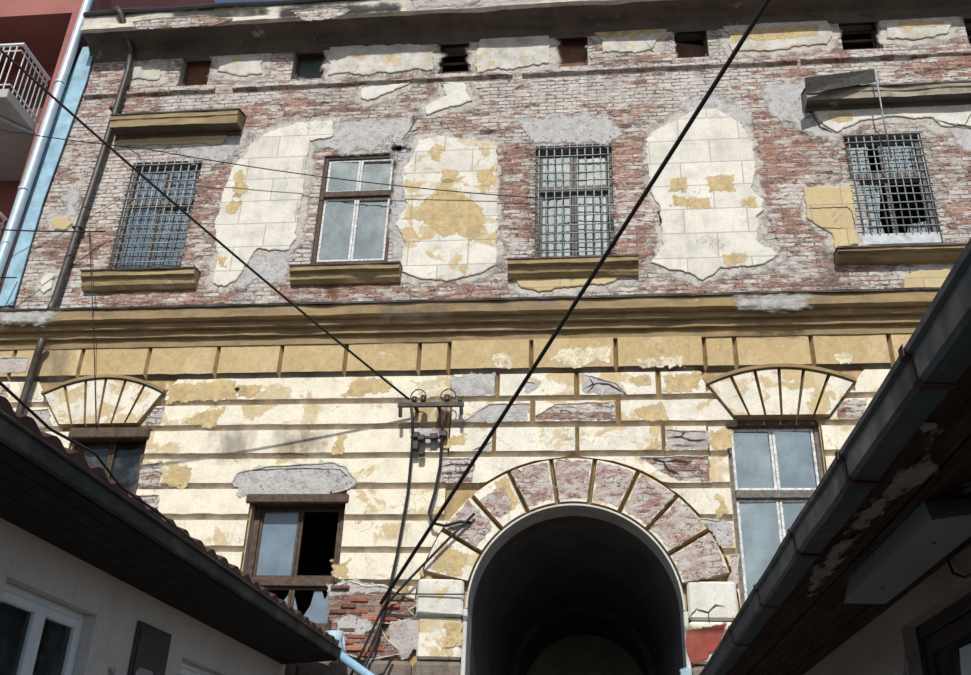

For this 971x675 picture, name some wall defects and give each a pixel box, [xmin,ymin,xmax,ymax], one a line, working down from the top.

peeling [718,20,841,59]
peeling [108,29,971,307]
peeling [30,210,101,266]
peeling [32,266,60,299]
spalling [231,434,358,498]
spalling [409,346,740,584]
crack [652,432,706,474]
peeling [806,421,944,597]
flaking render [326,557,464,661]
crack [690,604,722,622]